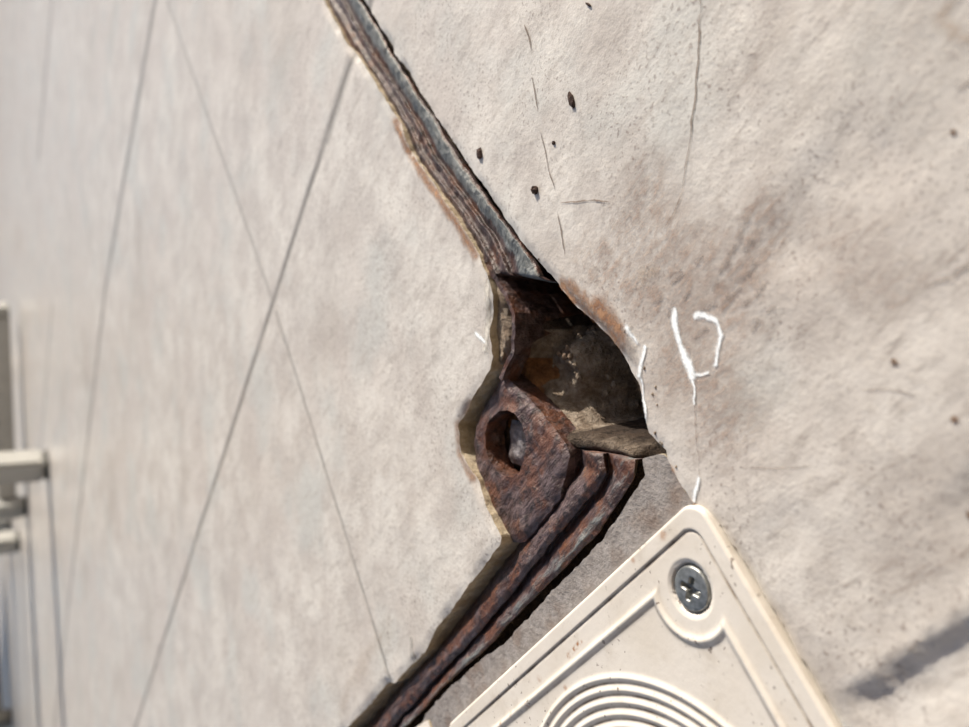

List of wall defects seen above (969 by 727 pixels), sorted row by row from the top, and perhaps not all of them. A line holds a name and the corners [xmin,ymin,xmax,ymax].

crack [665,2,701,226]
rust [393,118,477,257]
spalling [475,279,512,352]
rust [560,280,625,349]
spalling [524,250,667,461]